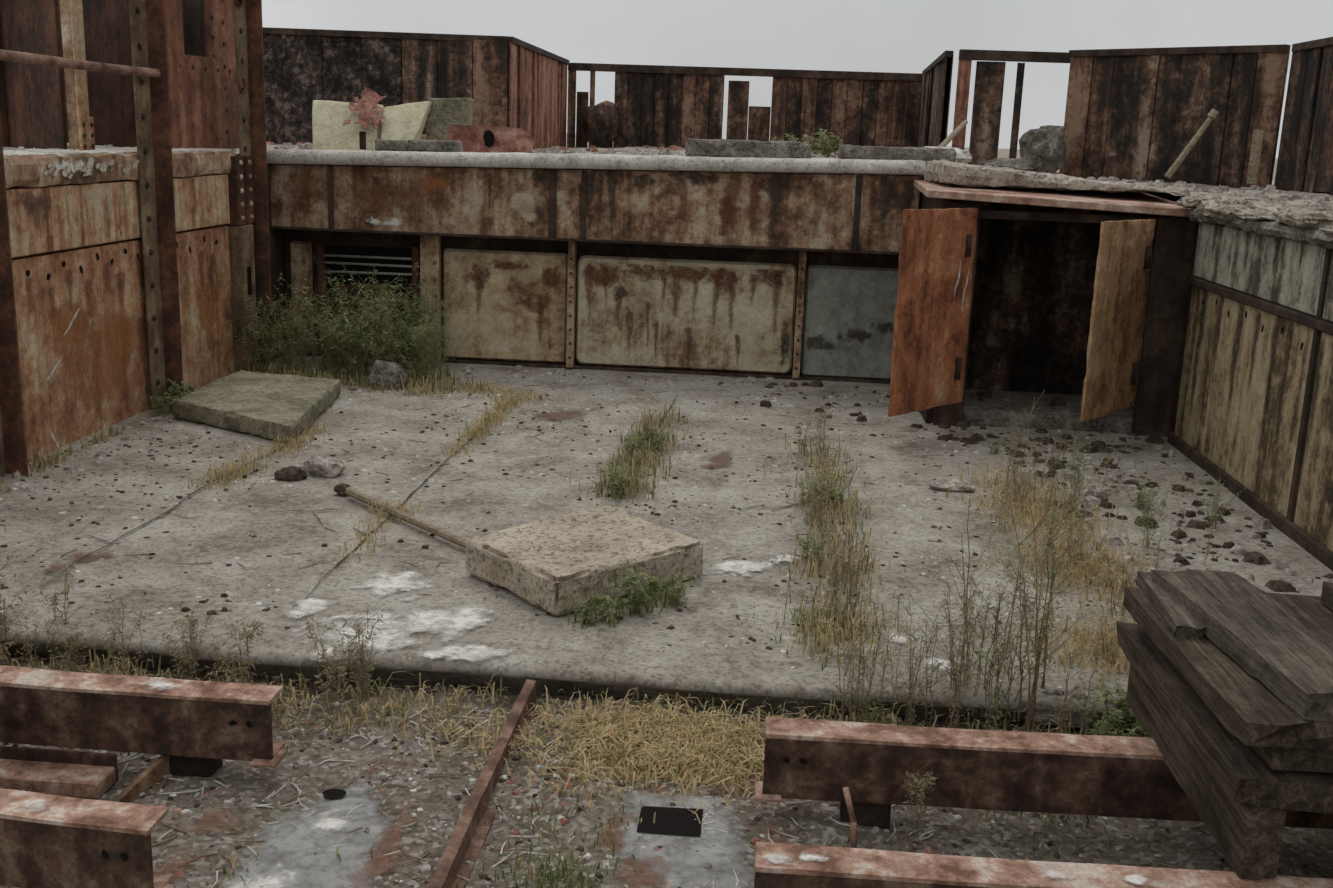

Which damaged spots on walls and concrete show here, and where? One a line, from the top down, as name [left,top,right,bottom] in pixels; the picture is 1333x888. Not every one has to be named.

peeling [44,157,139,179]
rust [719,176,782,235]
spalling [1175,194,1333,238]
rust [469,260,559,337]
rust [584,263,786,331]